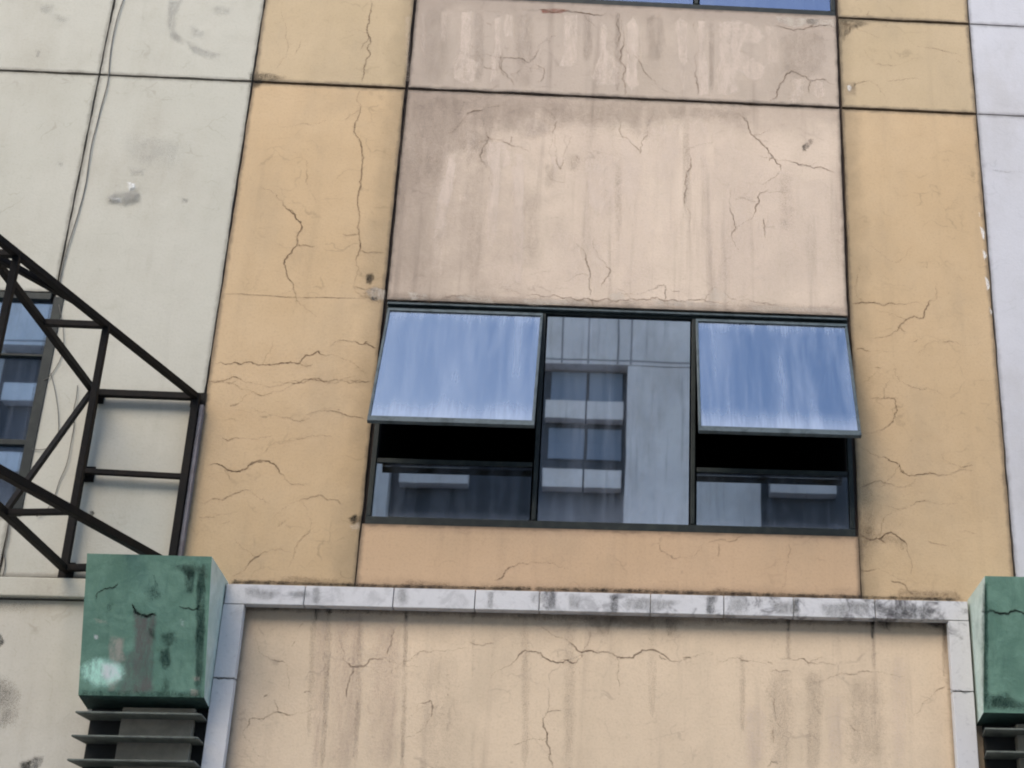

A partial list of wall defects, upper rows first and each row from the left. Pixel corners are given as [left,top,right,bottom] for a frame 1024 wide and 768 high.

crack [243,9,382,316]
crack [451,105,579,183]
crack [479,9,652,152]
damp [388,11,828,294]
crack [729,114,829,250]
crack [515,246,775,305]
crack [199,340,375,574]
crack [853,285,978,595]
crack [341,634,493,697]
crack [514,702,561,766]
crack [492,625,697,686]
damp [231,576,963,768]